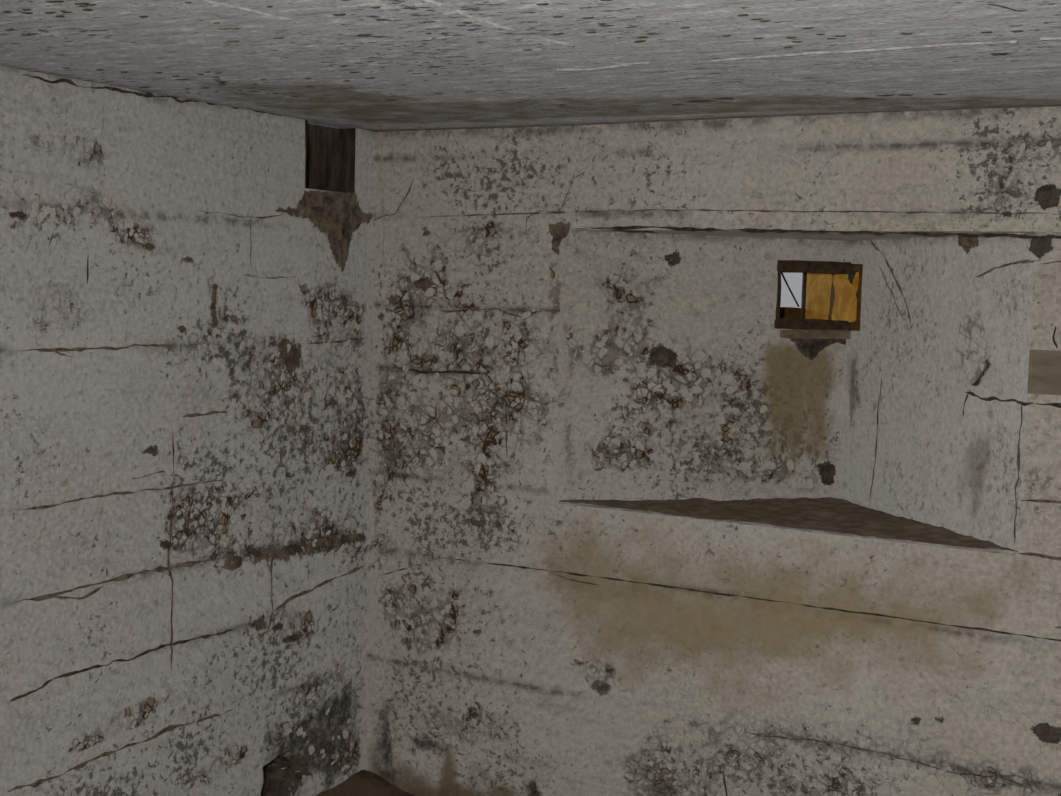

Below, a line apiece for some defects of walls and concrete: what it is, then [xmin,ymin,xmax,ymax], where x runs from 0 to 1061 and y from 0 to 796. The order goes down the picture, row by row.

spalling [275,190,373,272]
crack [430,172,1061,325]
peeling [197,227,558,533]
spalling [569,272,751,483]
crack [10,411,234,701]
spalling [160,485,385,571]
crack [259,557,1061,641]
leakage [587,571,874,651]
crack [963,391,1061,561]
leakage [265,687,352,796]
spalling [261,646,364,796]
leakage [377,710,513,796]